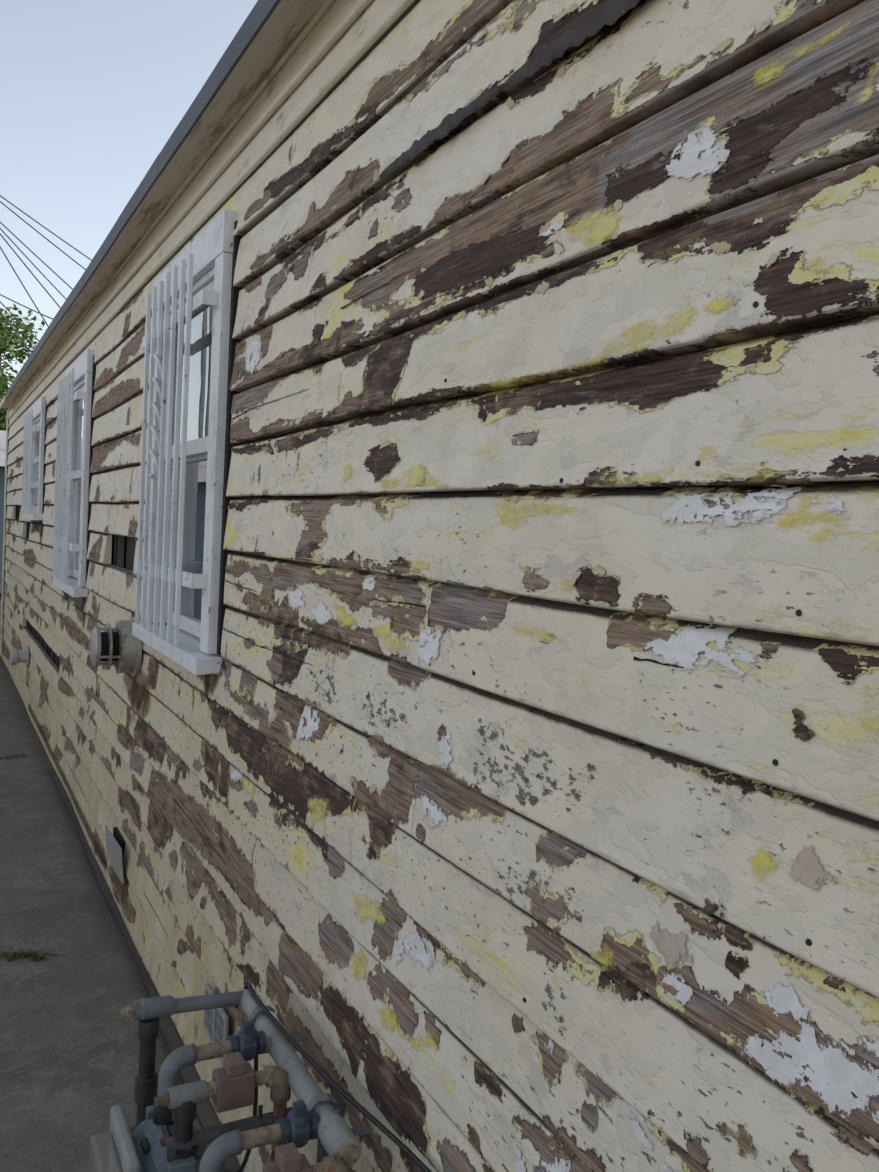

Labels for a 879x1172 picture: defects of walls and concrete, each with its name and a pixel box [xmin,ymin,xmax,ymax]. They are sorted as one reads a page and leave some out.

peeling [228,0,879,455]
peeling [45,400,56,431]
peeling [90,289,145,537]
peeling [2,439,596,1172]
peeling [615,734,815,807]
peeling [758,641,781,659]
peeling [813,642,879,686]
peeling [497,829,879,1172]